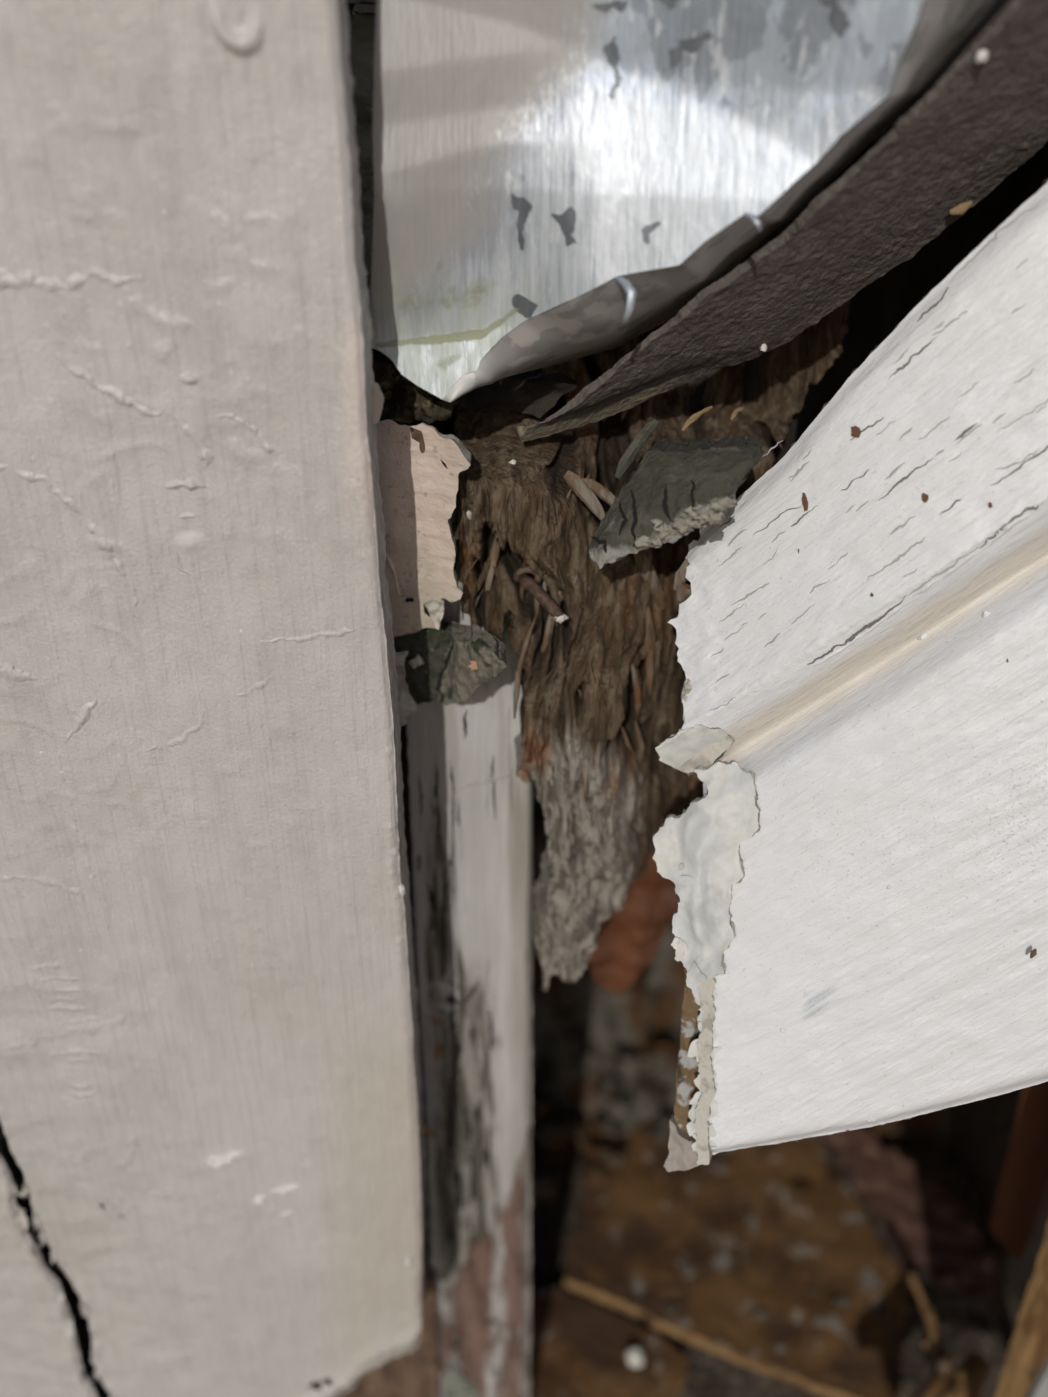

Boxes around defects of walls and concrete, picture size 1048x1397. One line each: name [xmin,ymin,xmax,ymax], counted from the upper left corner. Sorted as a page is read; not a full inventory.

crack [888,198,1045,380]
peeling [633,497,737,549]
crack [591,368,1048,710]
peeling [652,724,761,1165]
crack [6,1172,113,1397]
water stain [439,1163,531,1397]